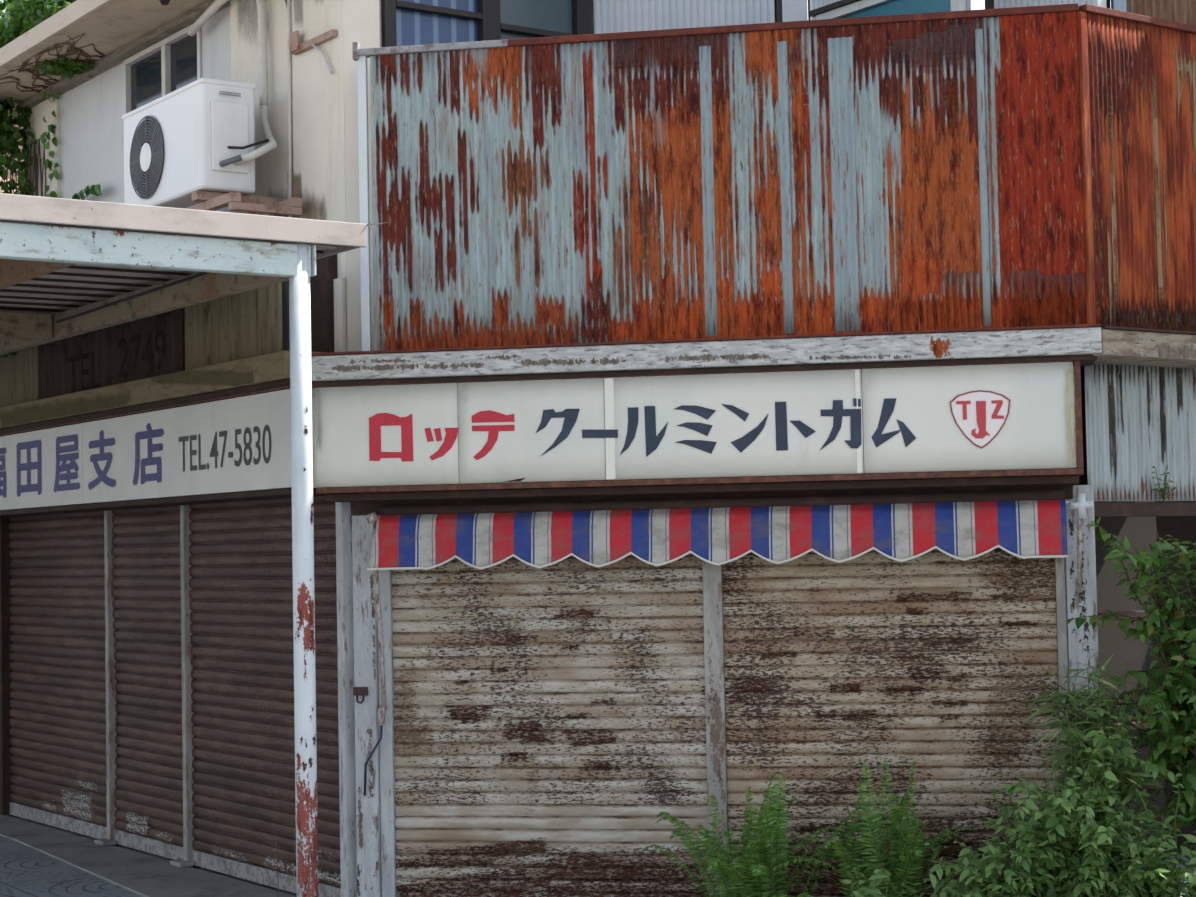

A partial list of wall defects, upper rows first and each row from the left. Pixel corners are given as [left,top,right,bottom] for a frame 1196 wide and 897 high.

rust [376,11,1196,358]
rust [553,608,597,620]
rust [896,590,1028,616]
rust [759,629,835,660]
rust [728,676,772,705]
rust [814,637,978,723]
rust [443,704,494,724]
rust [497,699,618,773]
rust [396,837,709,897]